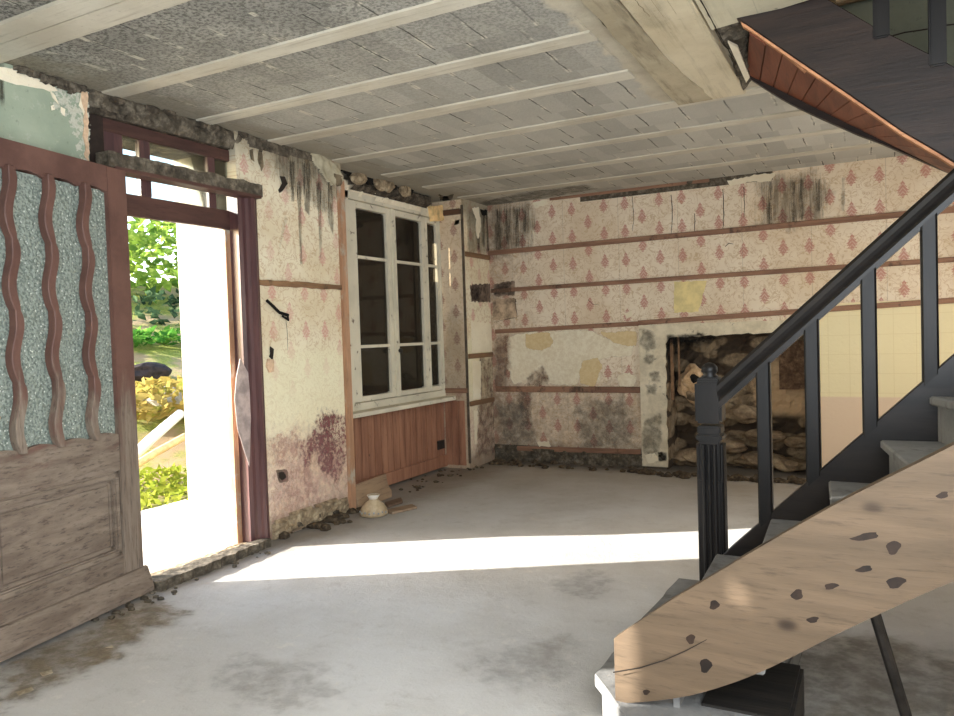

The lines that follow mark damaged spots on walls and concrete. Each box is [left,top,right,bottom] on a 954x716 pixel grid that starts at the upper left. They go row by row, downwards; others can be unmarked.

peeling [0,65,91,161]
damp [477,331,661,469]